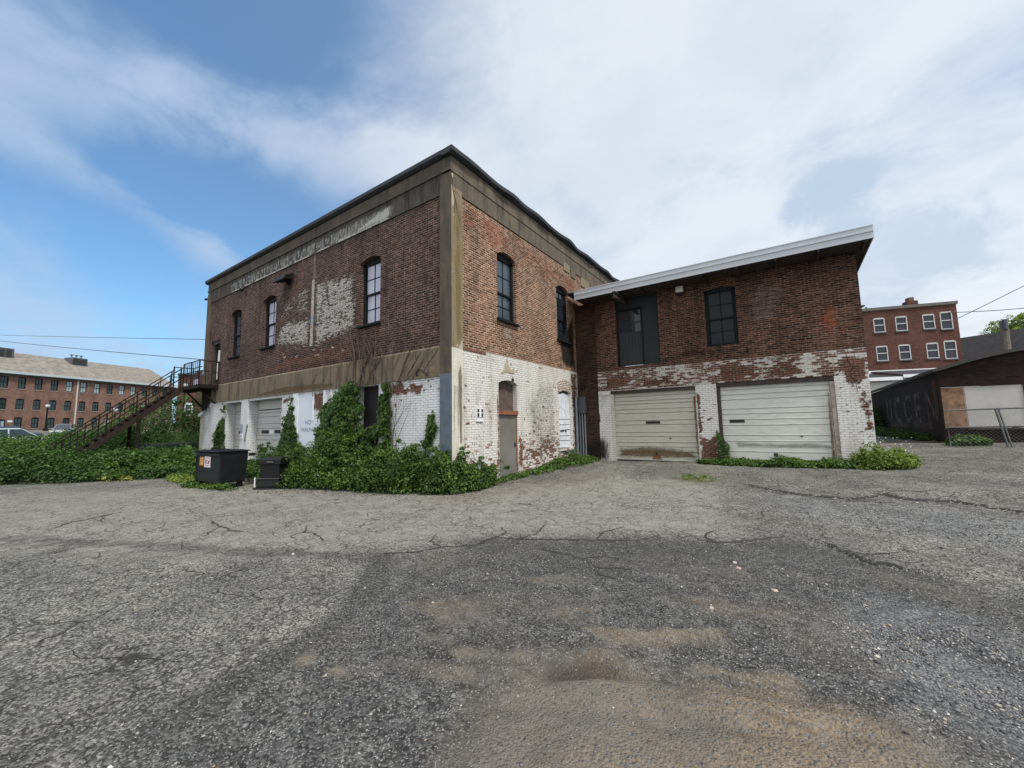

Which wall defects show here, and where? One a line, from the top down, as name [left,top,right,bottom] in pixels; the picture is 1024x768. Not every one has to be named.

peeling [277,273,356,358]
peeling [388,379,439,407]
peeling [518,406,560,470]
peeling [605,372,678,389]
peeling [696,394,719,459]
peeling [707,357,817,381]
peeling [840,356,874,444]